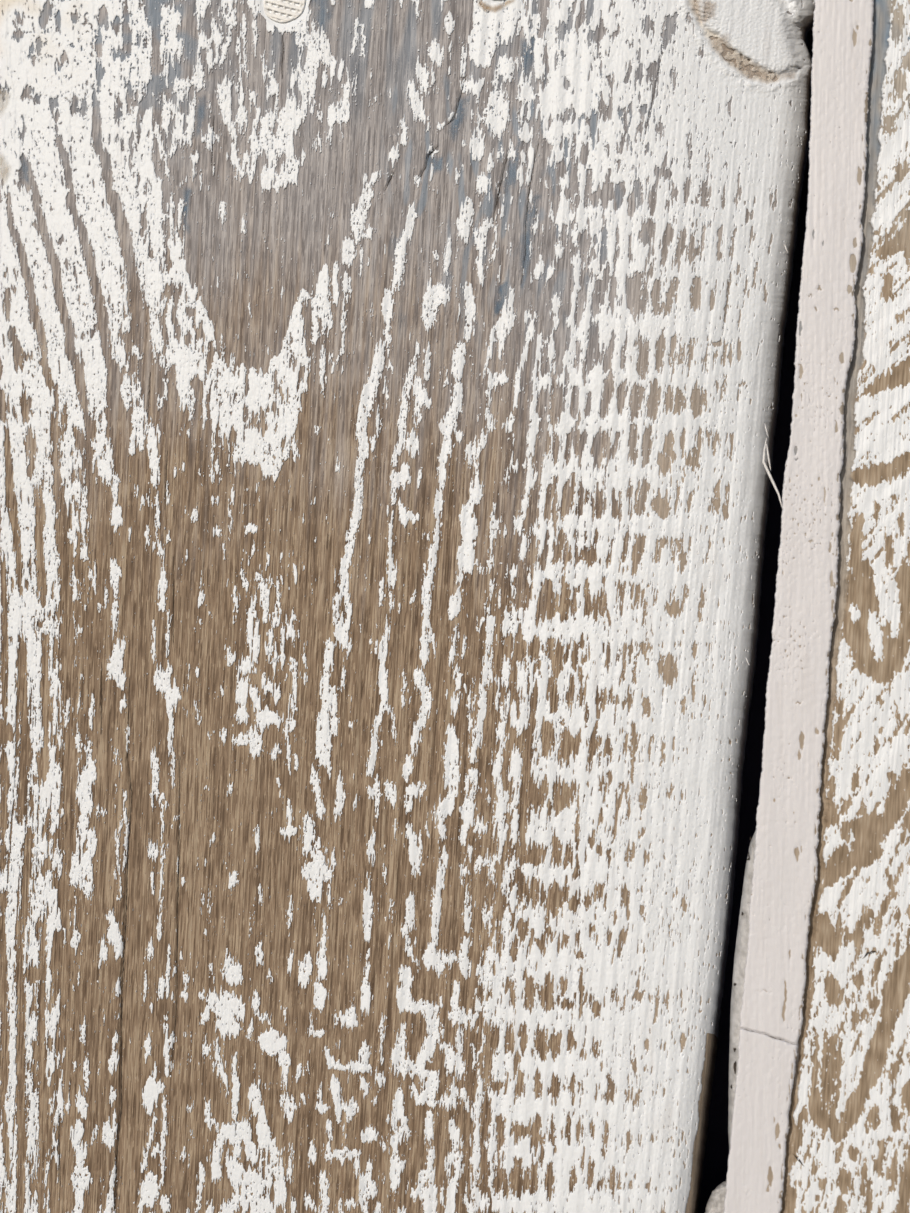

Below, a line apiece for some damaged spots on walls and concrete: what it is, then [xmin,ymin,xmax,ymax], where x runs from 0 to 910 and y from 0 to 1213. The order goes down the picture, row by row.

peeling [710,167,768,329]
peeling [651,530,696,575]
peeling [698,466,739,566]
peeling [664,584,689,625]
peeling [694,583,735,635]
peeling [766,0,910,1213]
peeling [674,641,724,723]
peeling [656,833,718,985]
crack [741,1028,799,1086]
peeling [638,1160,681,1213]